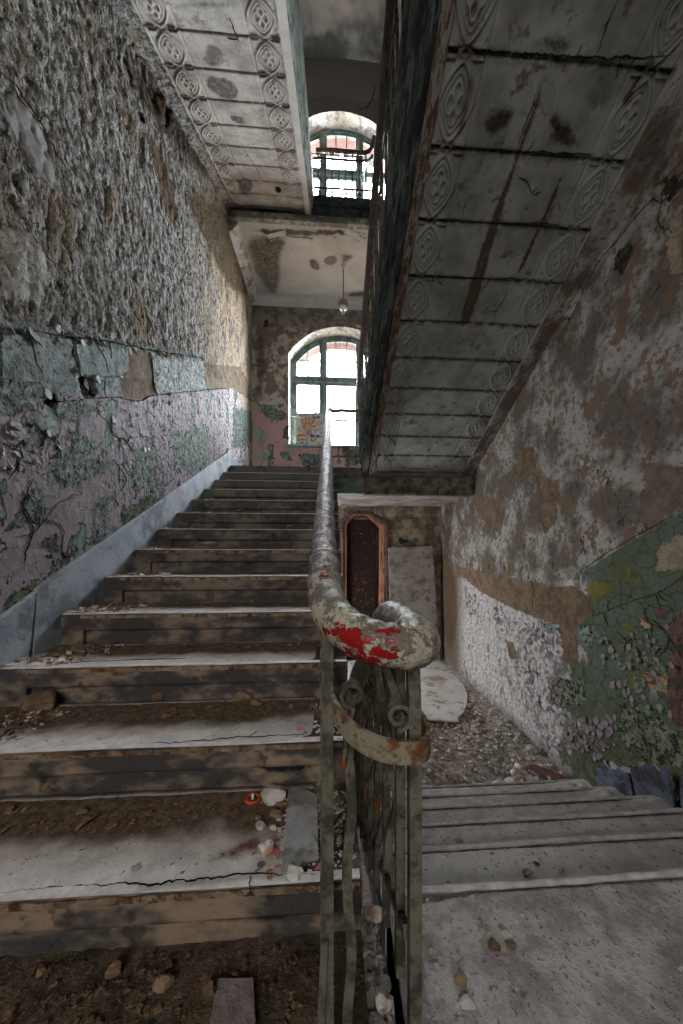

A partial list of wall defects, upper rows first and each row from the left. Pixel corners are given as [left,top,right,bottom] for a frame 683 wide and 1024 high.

water stain [206,46,238,99]
water stain [461,91,540,326]
water stain [518,178,561,272]
water stain [250,229,344,292]
peeling [0,323,321,534]
peeling [90,488,163,546]
flaking render [515,447,557,534]
flaking render [639,462,683,526]
flaking render [655,534,683,572]
peeling [4,578,44,611]
flaking render [441,550,683,801]
crack [0,872,286,894]